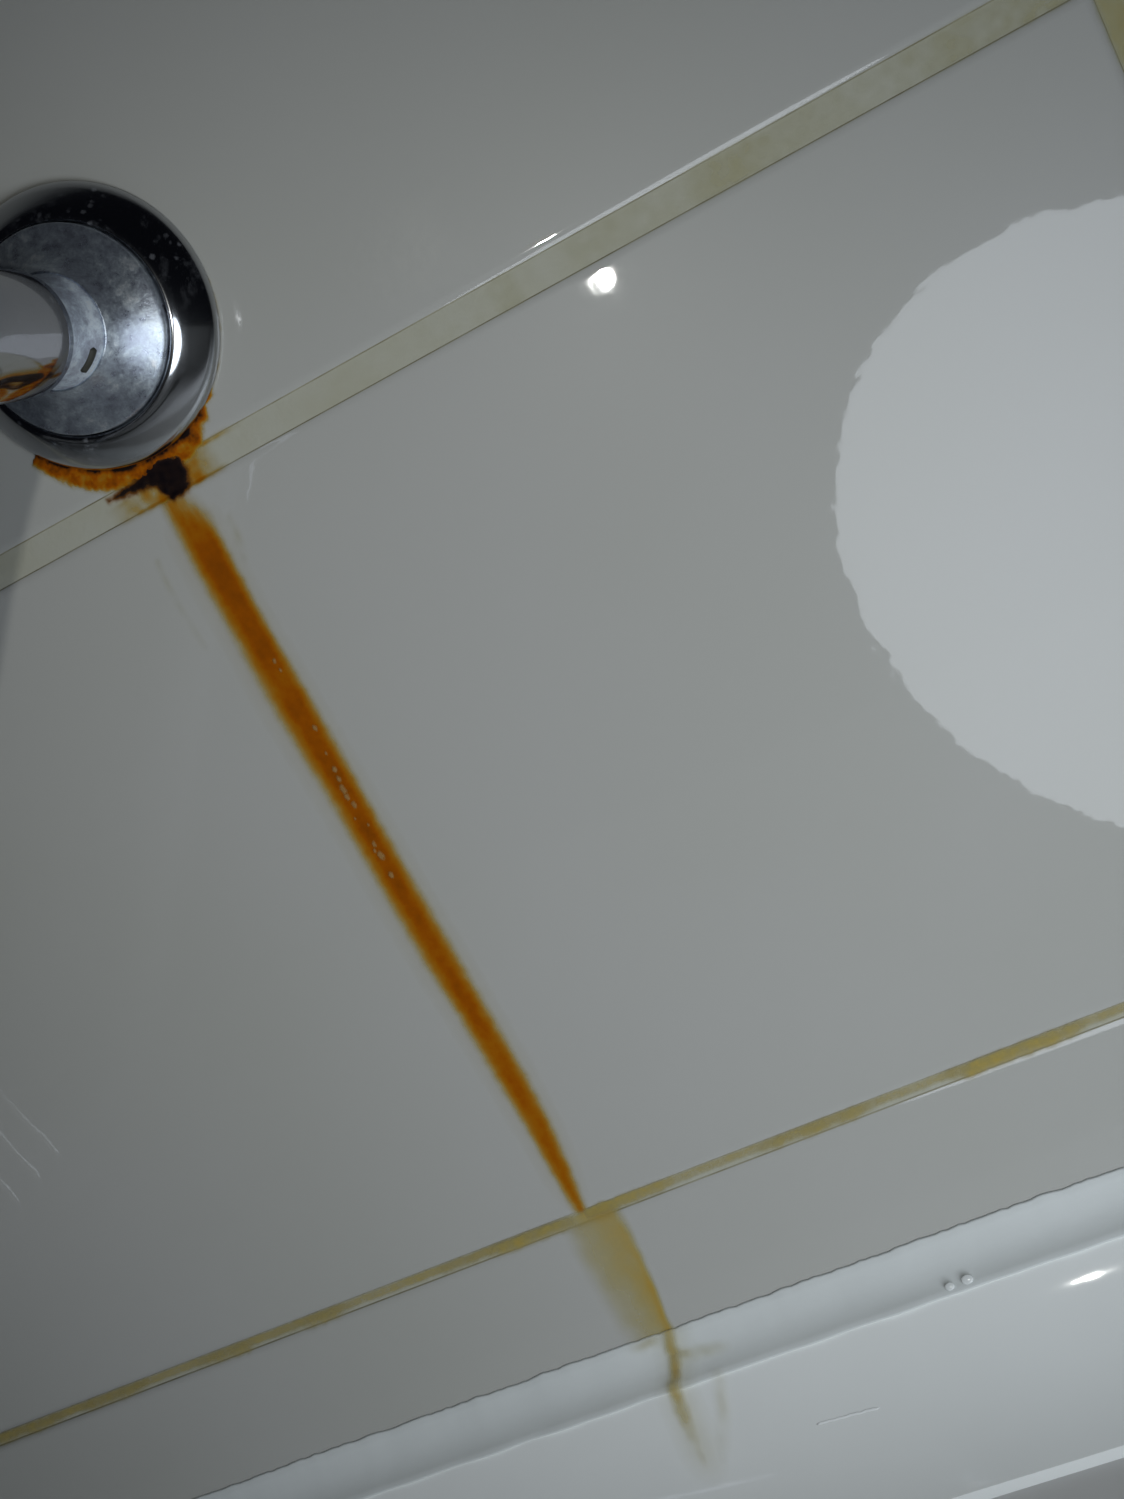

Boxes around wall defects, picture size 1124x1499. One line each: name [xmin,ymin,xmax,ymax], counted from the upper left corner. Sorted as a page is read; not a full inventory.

rust [33,389,685,1420]